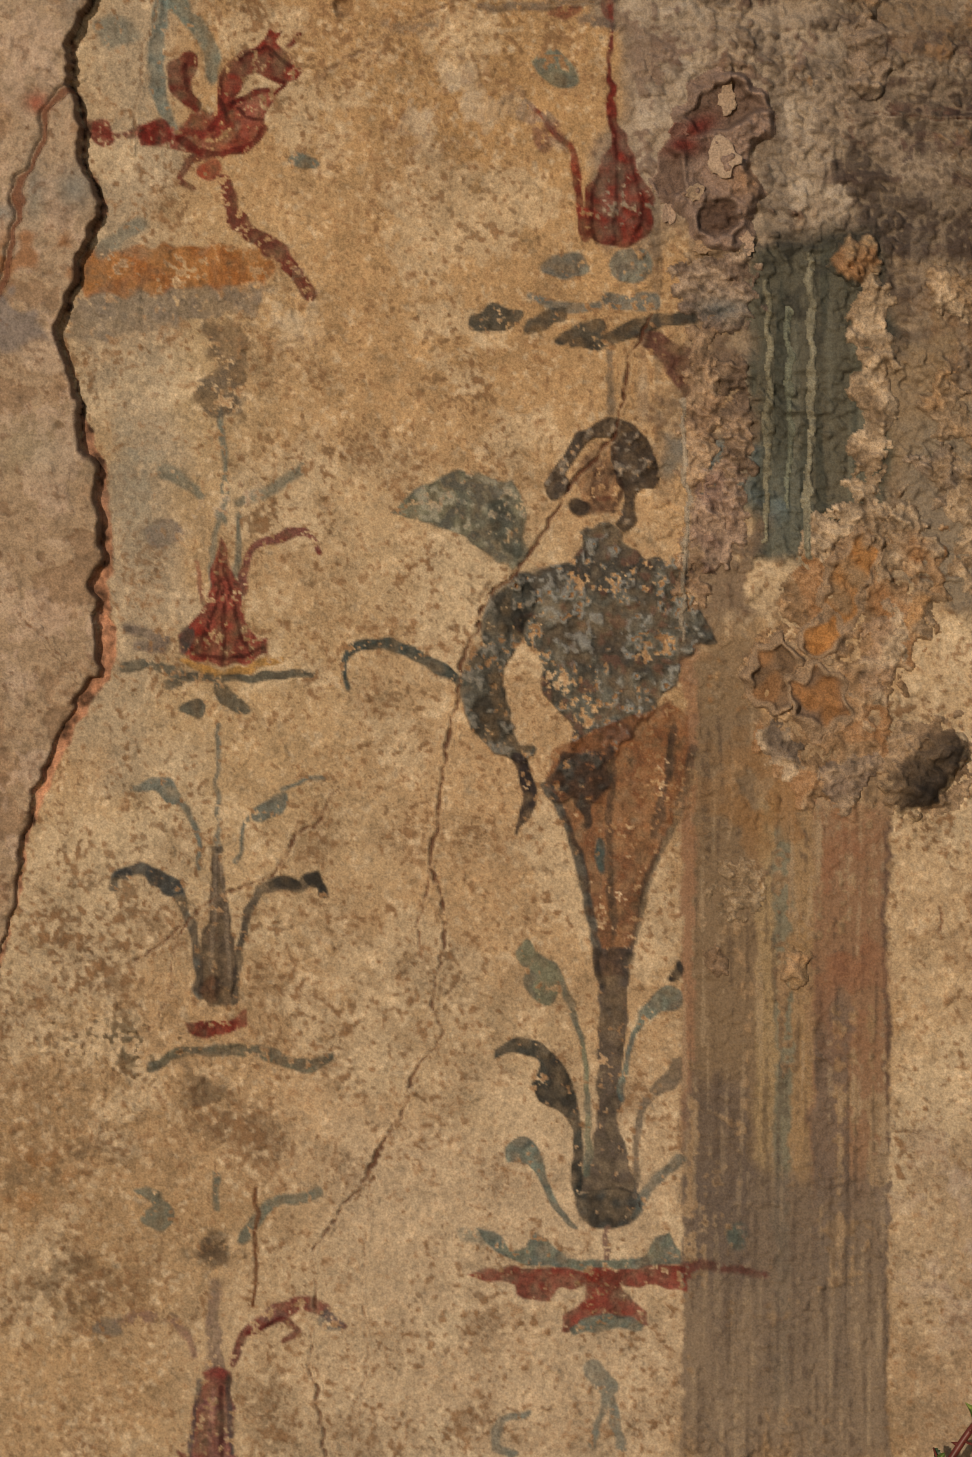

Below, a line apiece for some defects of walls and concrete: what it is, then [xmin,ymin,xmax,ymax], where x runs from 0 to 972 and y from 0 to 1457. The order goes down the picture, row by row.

peeling [648,66,778,256]
crack [0,0,164,969]
flaking render [739,525,883,743]
crack [122,782,347,1034]
crack [301,296,660,1457]